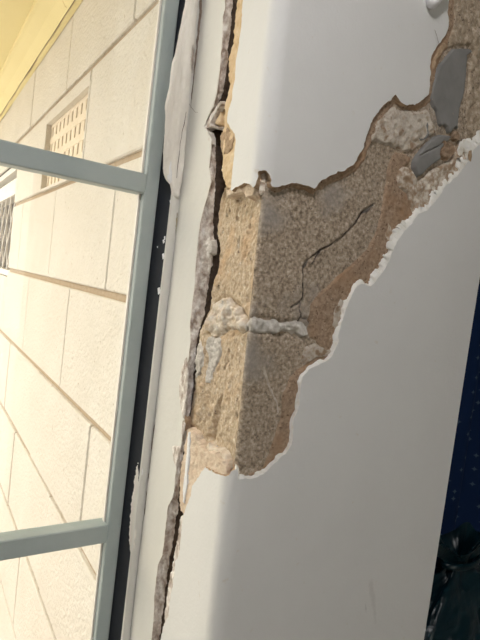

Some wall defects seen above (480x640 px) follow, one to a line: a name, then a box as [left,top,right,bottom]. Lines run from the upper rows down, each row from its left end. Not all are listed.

crack [144,408,157,516]
crack [151,0,238,640]
flaking render [162,0,480,631]
crack [296,204,373,323]